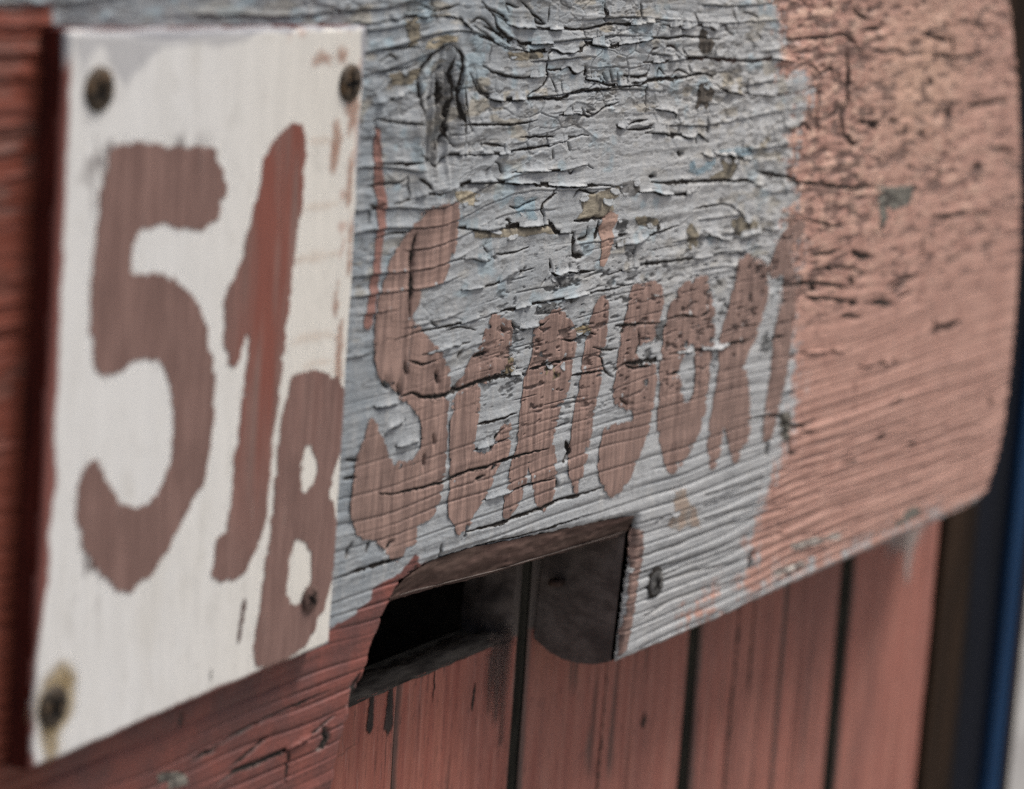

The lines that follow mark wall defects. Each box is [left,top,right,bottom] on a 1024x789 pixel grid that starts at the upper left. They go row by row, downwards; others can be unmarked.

peeling [698,26,715,54]
peeling [695,83,715,110]
peeling [690,147,754,179]
peeling [473,196,554,241]
peeling [577,179,659,232]
crack [354,1,1006,455]
peeling [732,214,759,236]
peeling [538,276,579,314]
peeling [778,412,791,441]
peeling [667,489,700,530]
peeling [617,528,644,656]
corrosion [38,665,73,760]